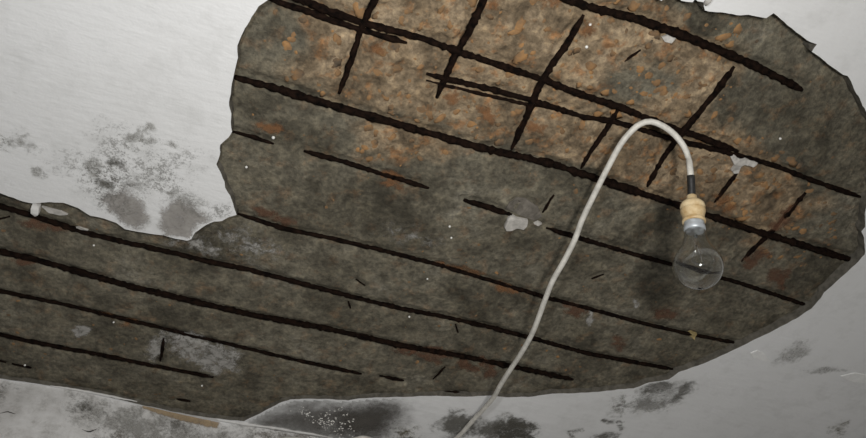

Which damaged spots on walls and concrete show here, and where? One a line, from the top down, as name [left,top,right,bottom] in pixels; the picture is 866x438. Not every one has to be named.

damp [88,161,120,188]
spalling [0,0,641,428]
spalling [463,0,866,397]
damp [148,333,240,374]
damp [637,382,691,410]
damp [80,404,225,438]
damp [248,404,398,438]
damp [443,412,537,438]